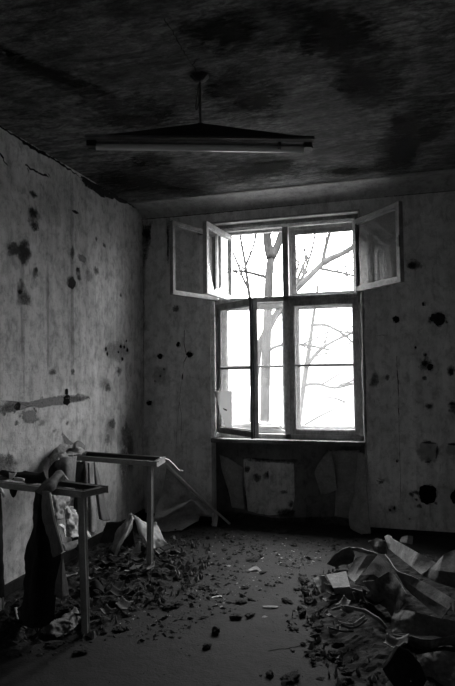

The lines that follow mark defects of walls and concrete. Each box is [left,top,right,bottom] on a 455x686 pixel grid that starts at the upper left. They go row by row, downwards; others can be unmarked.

crack [0,125,80,178]
leakage [8,241,31,263]
spalling [67,248,86,291]
leakage [18,283,30,304]
spalling [428,312,448,327]
spalling [415,346,433,380]
spalling [409,484,438,508]